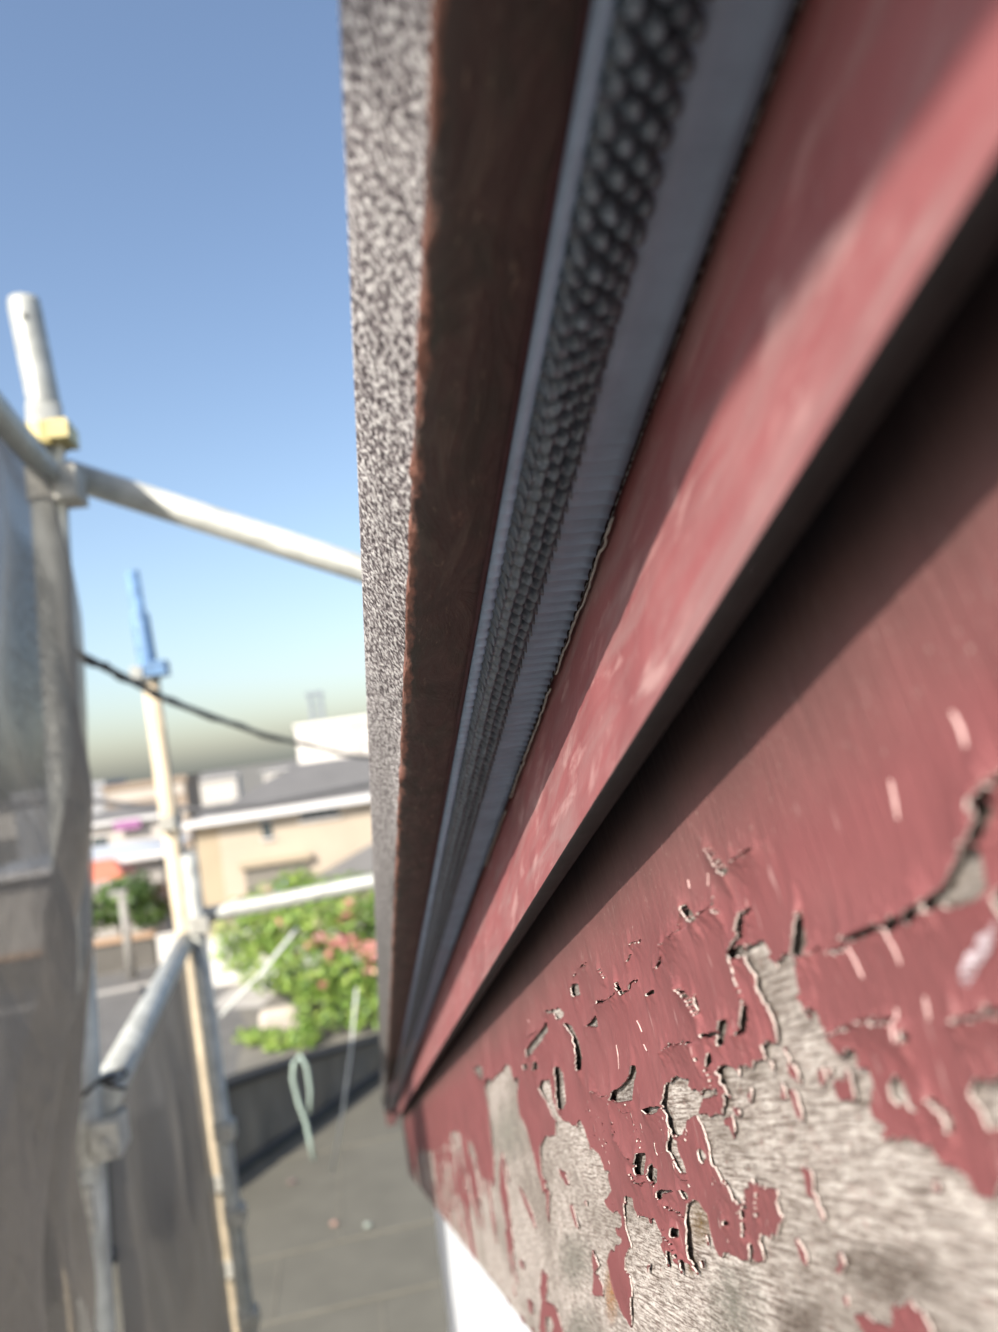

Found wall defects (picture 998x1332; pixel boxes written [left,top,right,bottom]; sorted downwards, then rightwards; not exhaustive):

crack [833,901,934,951]
peeling [411,940,998,1332]